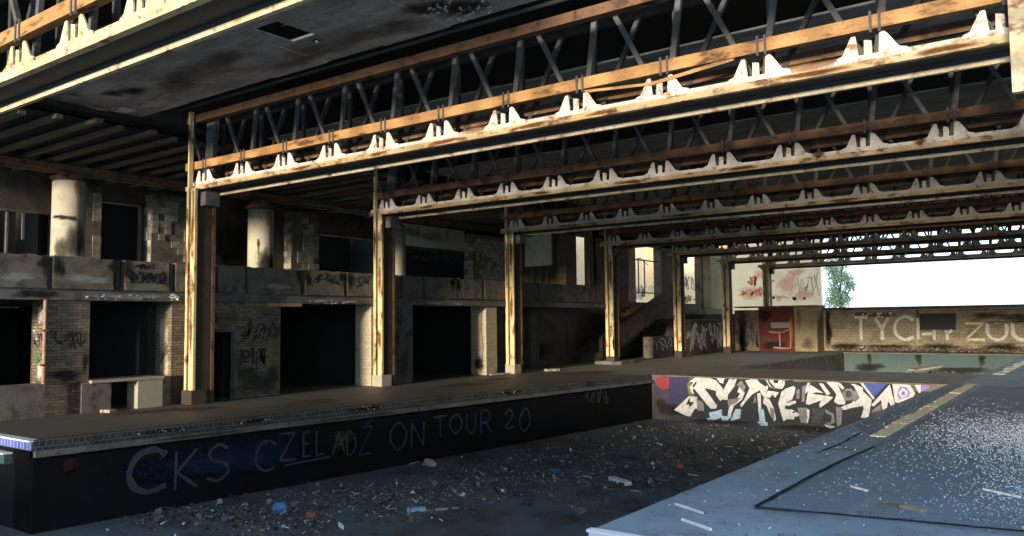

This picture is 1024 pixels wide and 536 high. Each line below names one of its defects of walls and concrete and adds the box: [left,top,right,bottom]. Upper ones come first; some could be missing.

corrosion [920,43,973,55]
corrosion [782,60,842,79]
corrosion [434,127,485,144]